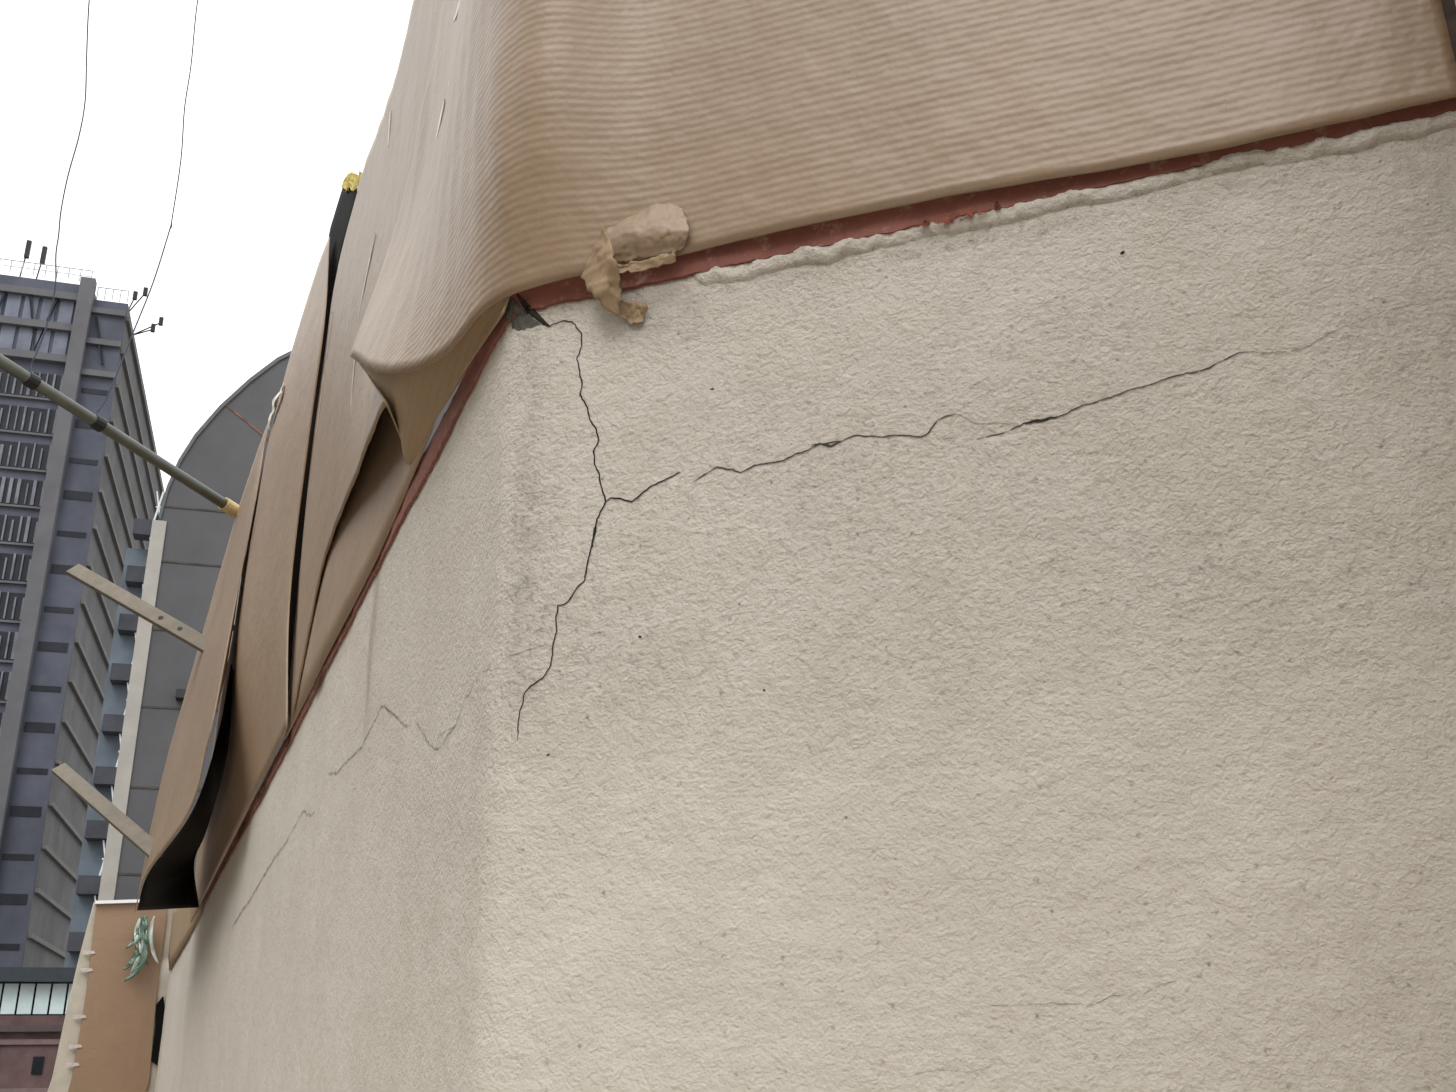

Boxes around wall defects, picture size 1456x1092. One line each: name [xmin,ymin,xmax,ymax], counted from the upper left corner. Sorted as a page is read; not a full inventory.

flaking render [506,293,551,331]
crack [517,312,1329,738]